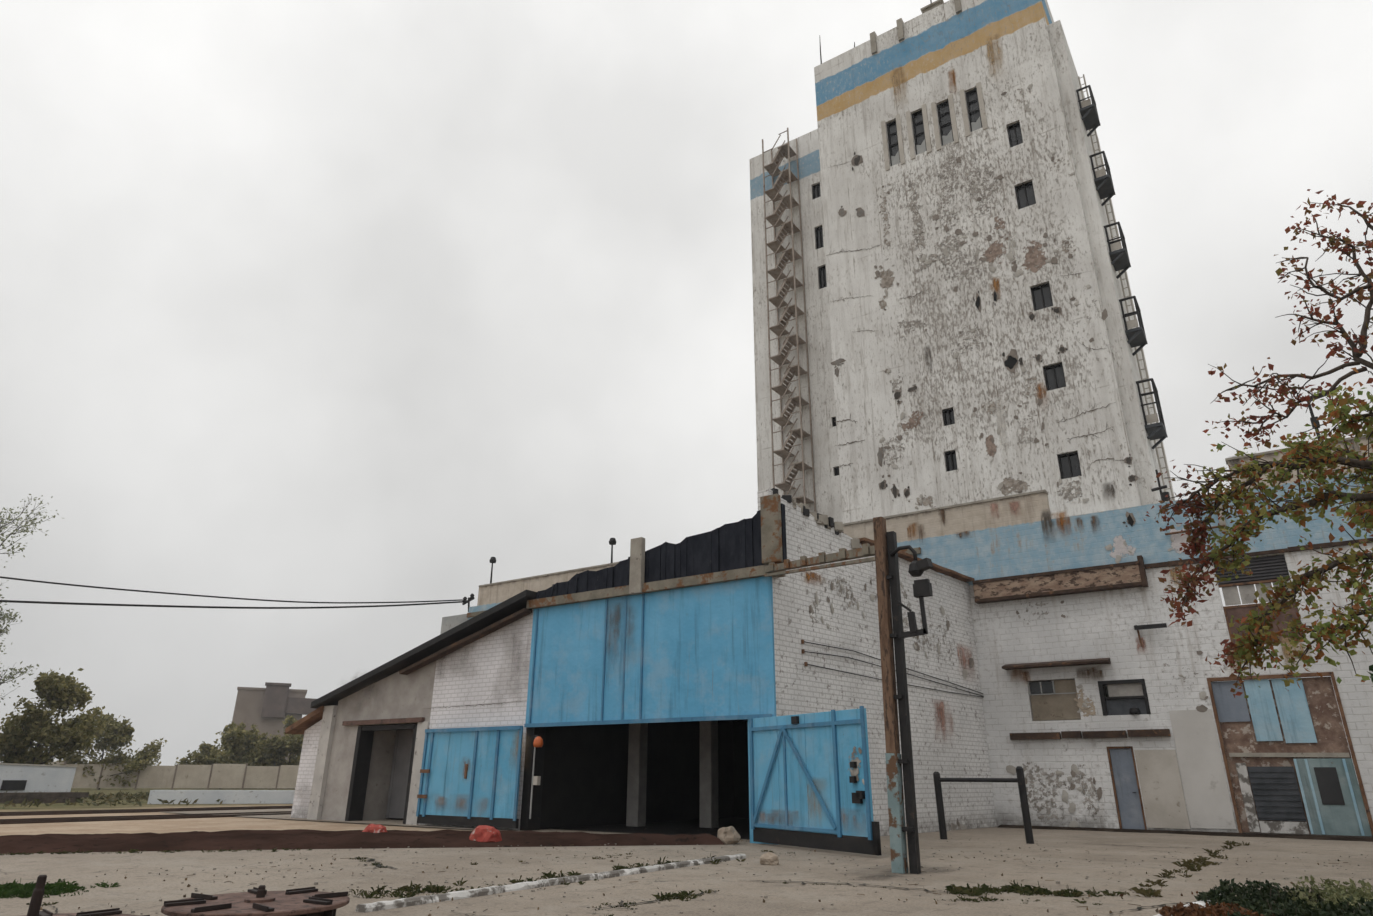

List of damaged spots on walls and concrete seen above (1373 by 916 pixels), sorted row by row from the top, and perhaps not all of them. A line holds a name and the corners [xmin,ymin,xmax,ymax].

spalling [851,152,863,171]
peeling [838,183,899,311]
peeling [908,153,1076,457]
peeling [1052,285,1108,343]
peeling [877,368,936,509]
peeling [998,472,1030,495]
peeling [1057,476,1089,503]
spalling [1124,454,1138,486]
peeling [1104,511,1136,563]
peeling [1168,524,1230,554]
peeling [809,575,877,628]
peeling [1006,762,1105,827]